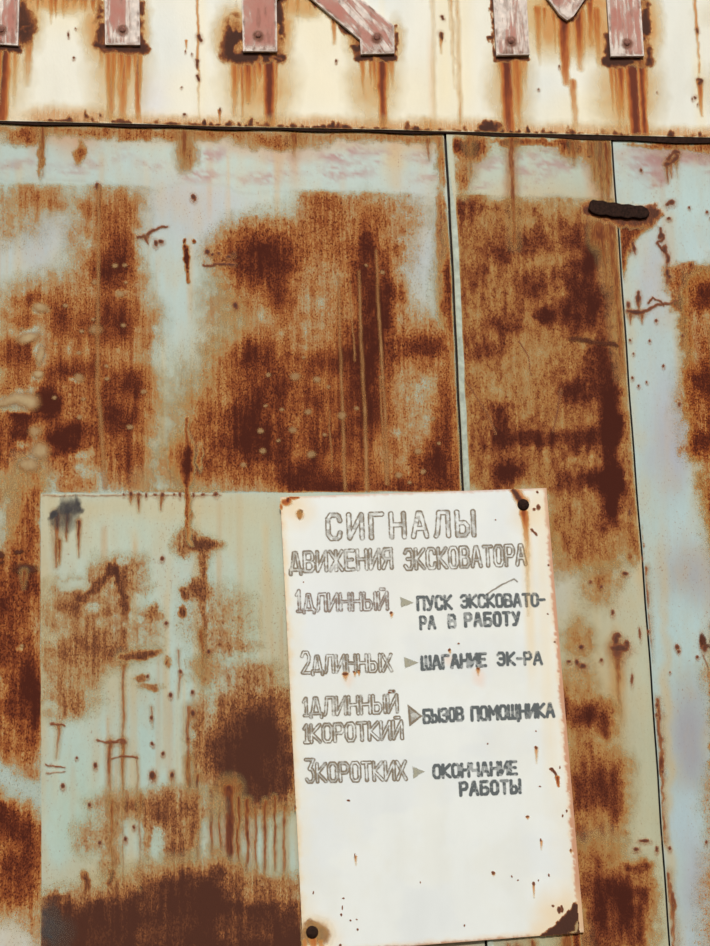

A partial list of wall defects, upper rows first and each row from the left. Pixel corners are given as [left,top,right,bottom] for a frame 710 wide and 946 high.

peeling [0,0,17,43]
peeling [107,0,126,42]
peeling [243,0,275,46]
peeling [317,0,392,52]
peeling [610,0,642,54]
corrosion [693,0,704,114]
corrosion [623,128,710,182]
corrosion [446,0,664,608]
corrosion [661,260,710,557]
corrosion [0,0,462,946]
corrosion [507,615,677,946]
corrosion [692,743,710,945]